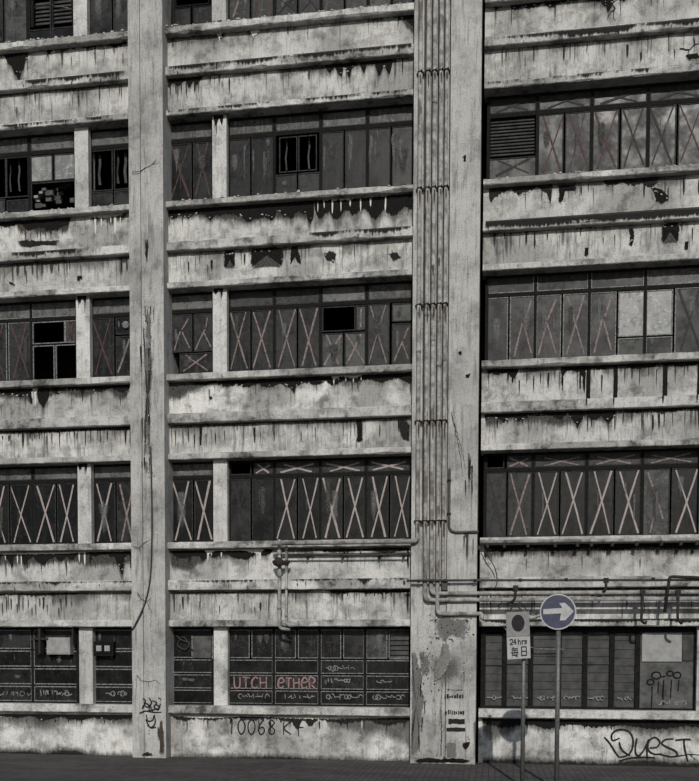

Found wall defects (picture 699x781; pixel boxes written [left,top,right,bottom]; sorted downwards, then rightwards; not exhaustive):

water stain [494,18,699,72]
water stain [0,217,76,239]
water stain [3,249,129,287]
water stain [89,214,122,235]
spalling [224,246,301,268]
water stain [295,194,413,258]
water stain [422,0,451,530]
water stain [485,190,699,251]
water stain [486,361,699,430]
water stain [0,551,132,615]
peeling [411,614,475,763]
water stain [482,718,699,739]